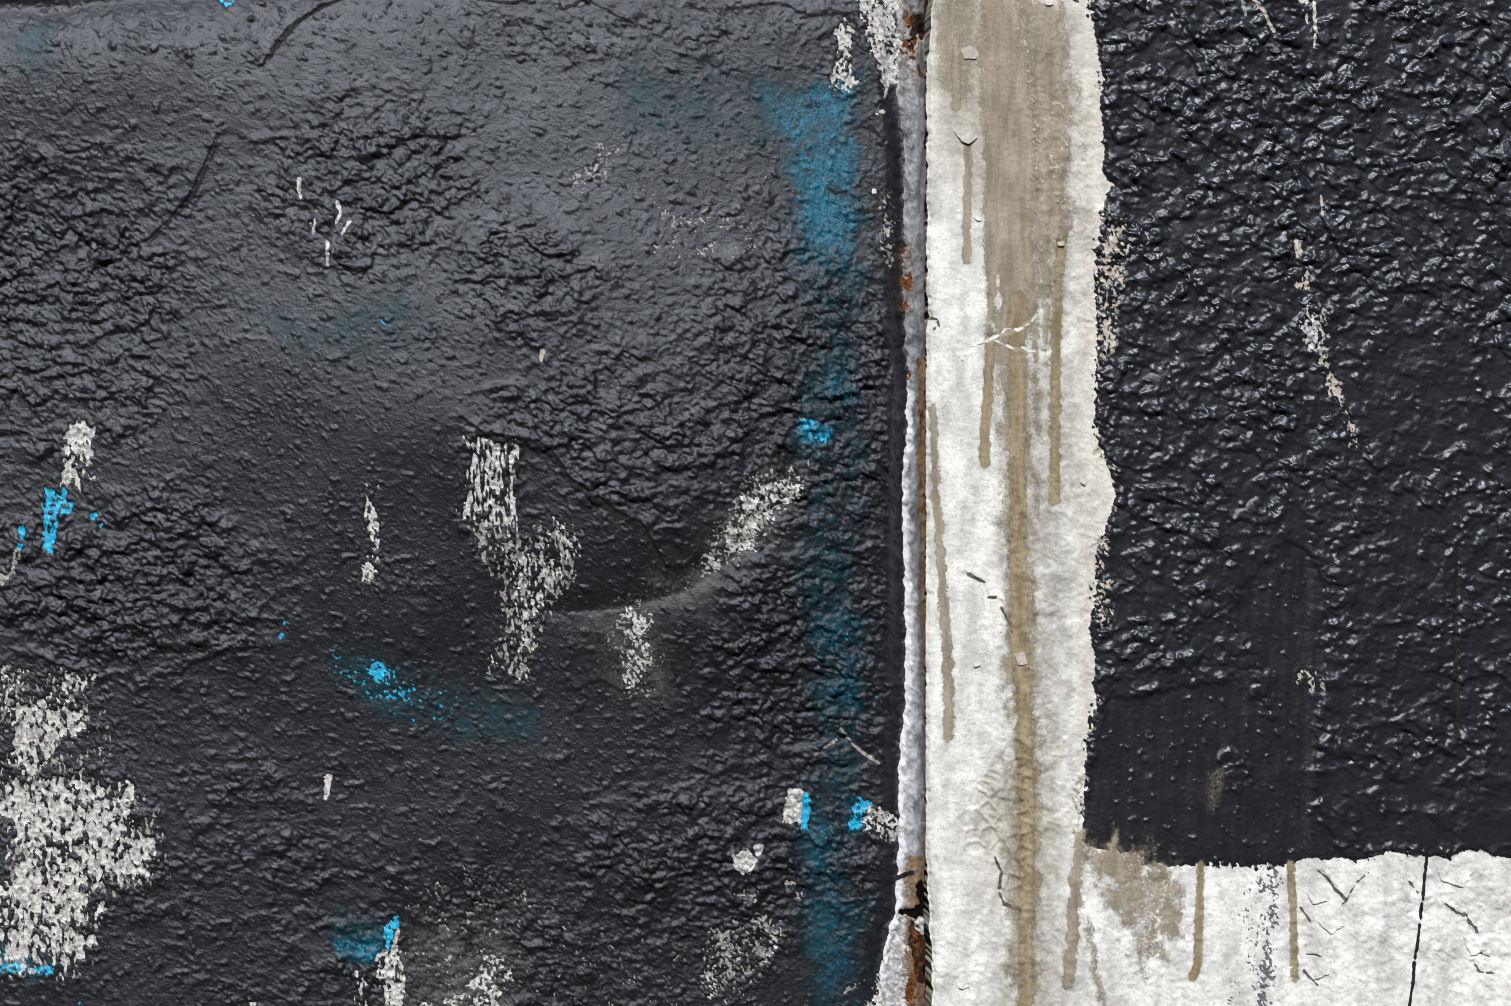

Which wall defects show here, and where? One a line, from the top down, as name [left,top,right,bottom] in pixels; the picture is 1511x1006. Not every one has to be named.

peeling [795,0,906,248]
peeling [872,188,900,269]
rust [896,12,924,84]
peeling [456,435,583,683]
rust [906,358,926,643]
leakage [928,404,955,743]
leakage [936,0,1085,1006]
peeling [0,665,171,983]
rust [901,854,926,1006]
leakage [1061,829,1205,1006]
leakage [1287,860,1299,982]
crack [1408,855,1494,1006]